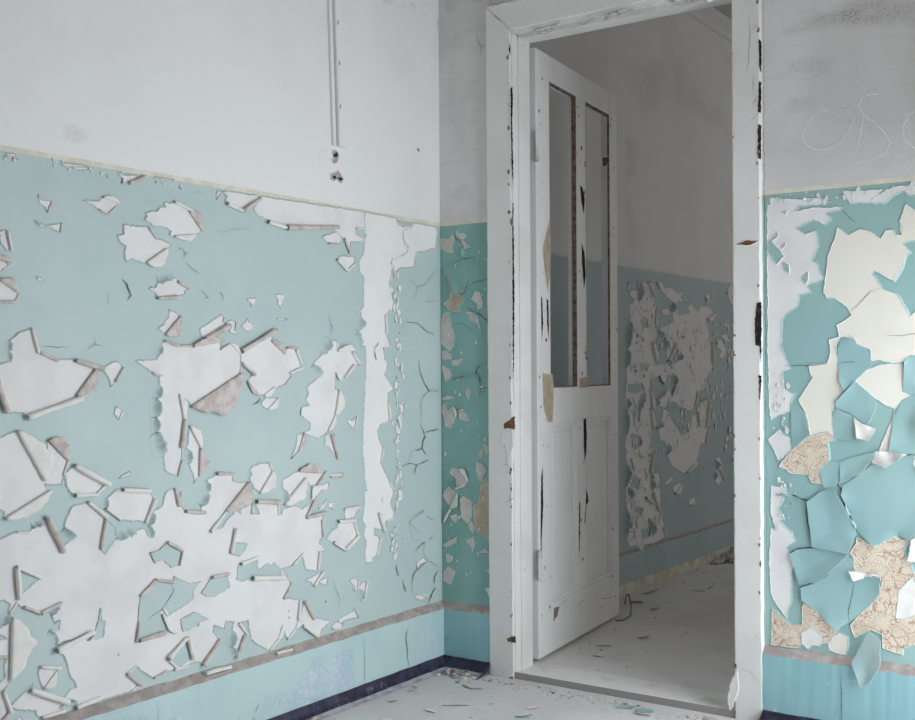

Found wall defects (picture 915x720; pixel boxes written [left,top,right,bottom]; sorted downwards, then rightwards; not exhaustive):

peeling [48,158,182,190]
spalling [329,149,344,185]
crack [410,227,488,402]
crack [396,424,443,603]
peeling [612,280,736,550]
peeling [736,180,915,689]